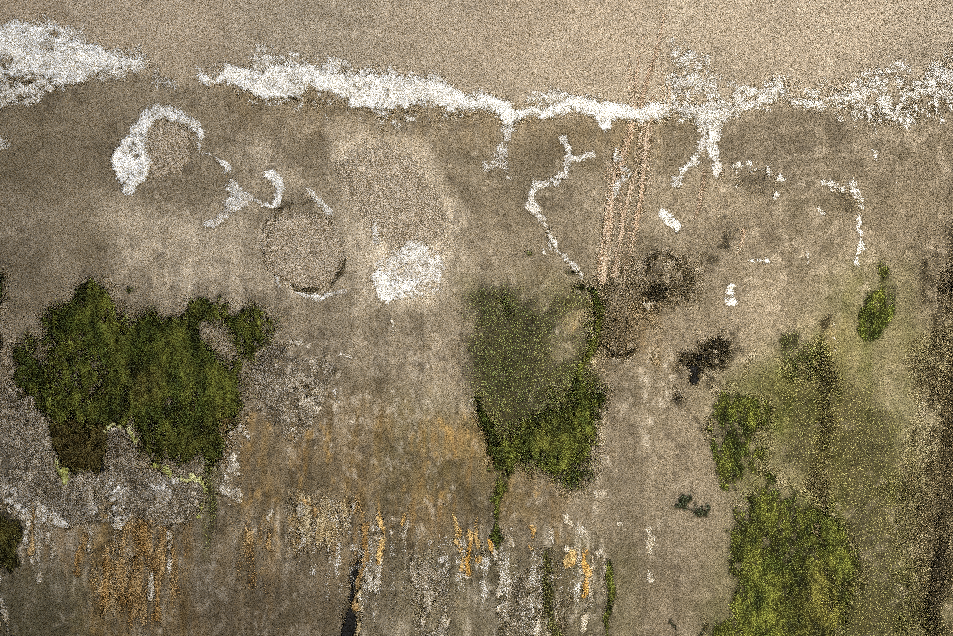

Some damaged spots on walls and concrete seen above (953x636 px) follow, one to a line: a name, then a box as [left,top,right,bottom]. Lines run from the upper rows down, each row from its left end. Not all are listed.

damp [0,15,177,108]
efflorescence [111,105,285,229]
damp [196,38,953,291]
efflorescence [371,233,444,304]
damp [678,331,739,385]
flaking render [0,384,206,531]
flaking render [219,425,250,503]
corrosion [23,489,57,584]
corrosion [91,517,179,627]
corrosion [293,493,409,611]
crack [341,561,363,636]
corrosion [444,504,502,580]